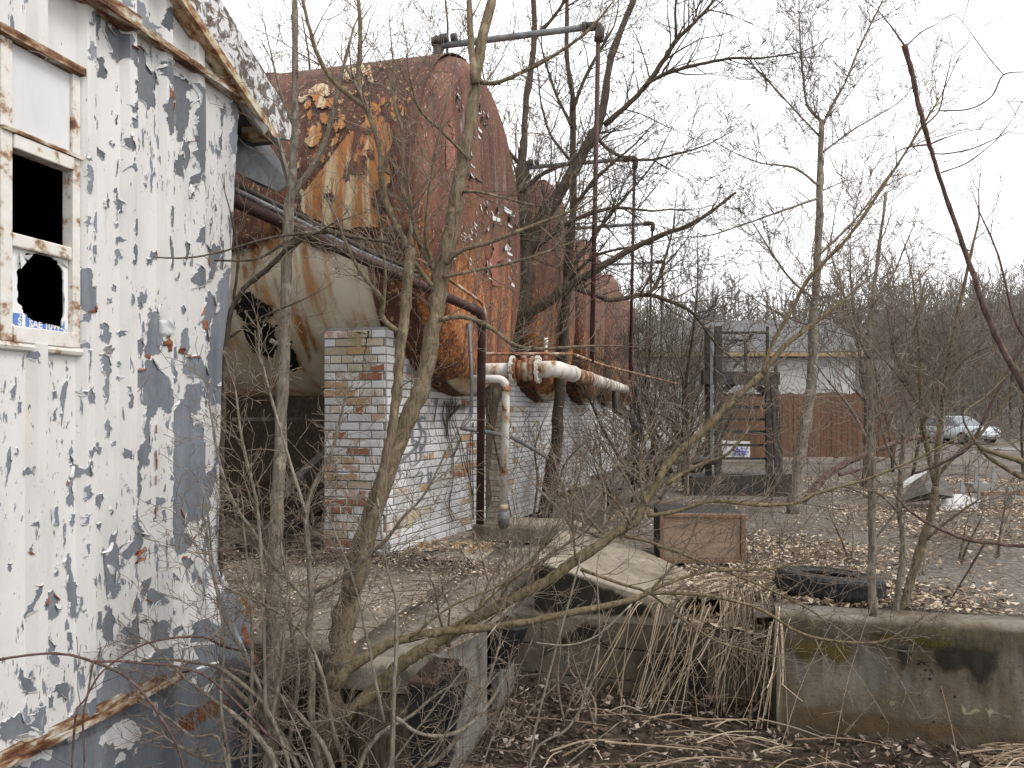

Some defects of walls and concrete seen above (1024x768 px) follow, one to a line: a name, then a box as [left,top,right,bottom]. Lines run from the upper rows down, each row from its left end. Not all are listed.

peeling [122,0,173,37]
peeling [446,85,464,170]
rust [348,148,374,175]
peeling [454,201,518,295]
rust [297,315,317,359]
peeling [0,9,250,744]
peeling [324,347,385,414]
damp [937,646,998,685]
peeling [14,750,53,768]
peeling [99,719,142,766]